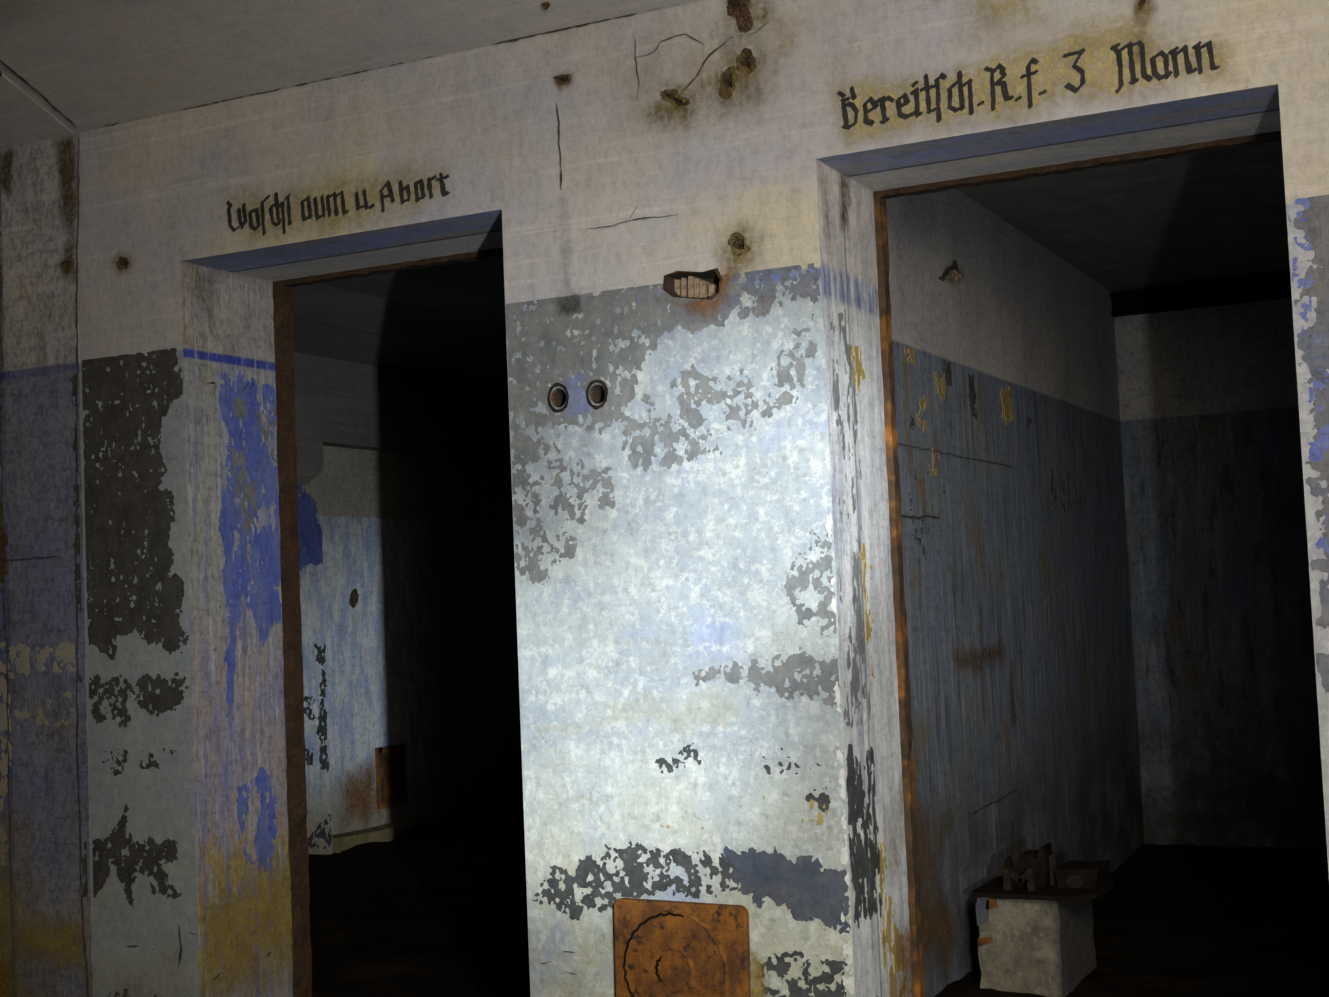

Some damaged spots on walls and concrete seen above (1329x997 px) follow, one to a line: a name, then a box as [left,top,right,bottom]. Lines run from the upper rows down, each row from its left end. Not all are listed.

crack [182,56,433,110]
crack [492,4,767,97]
spalling [654,89,692,120]
spalling [716,0,767,103]
peeling [1288,194,1329,629]
peeling [218,370,282,717]
peeling [297,485,323,572]
peeling [0,348,189,867]
peeling [506,230,905,997]
peeling [1316,653,1329,693]
peeling [81,803,183,908]
peeling [236,767,278,873]